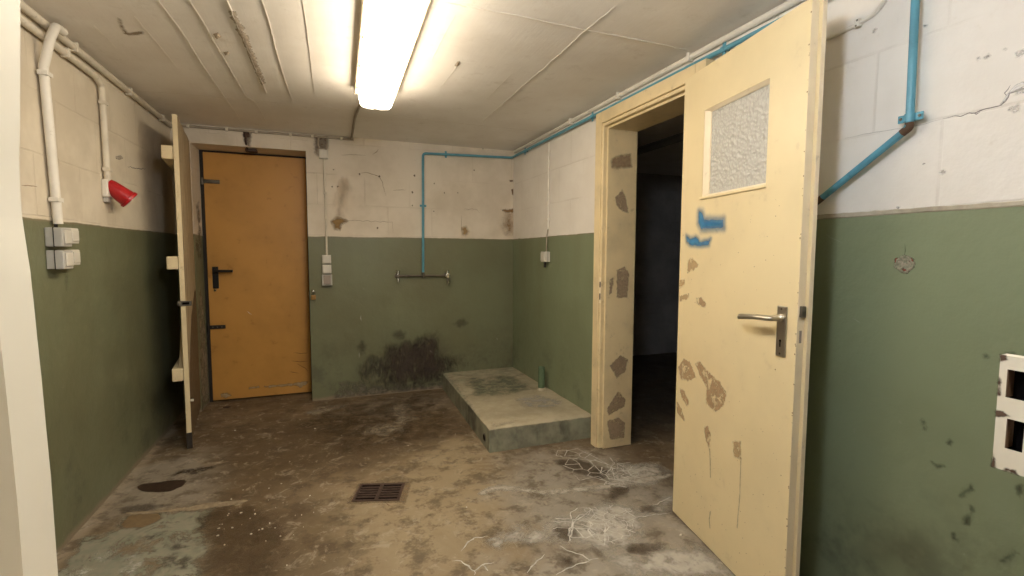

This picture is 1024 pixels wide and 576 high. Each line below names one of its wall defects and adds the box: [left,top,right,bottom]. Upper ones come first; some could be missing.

crack [849,82,1024,138]
leakage [312,337,457,450]
crack [455,448,673,575]